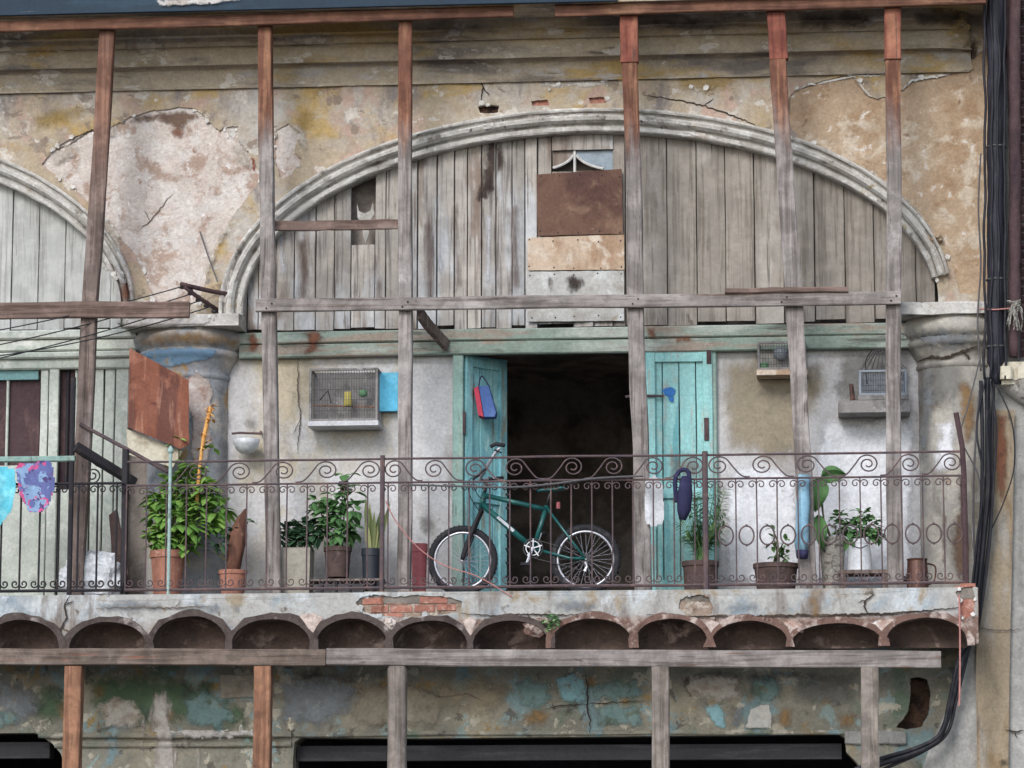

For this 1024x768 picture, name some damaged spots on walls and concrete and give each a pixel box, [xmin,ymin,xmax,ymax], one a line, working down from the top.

crack [645,95,760,127]
crack [799,74,950,97]
flaking render [43,130,94,202]
flaking render [274,124,305,178]
water stain [478,143,503,201]
crack [140,196,171,230]
flaking render [102,107,259,330]
crack [918,346,978,362]
crack [293,359,301,454]
flaking render [357,591,476,635]
spalling [679,593,720,632]
hole [897,678,930,729]